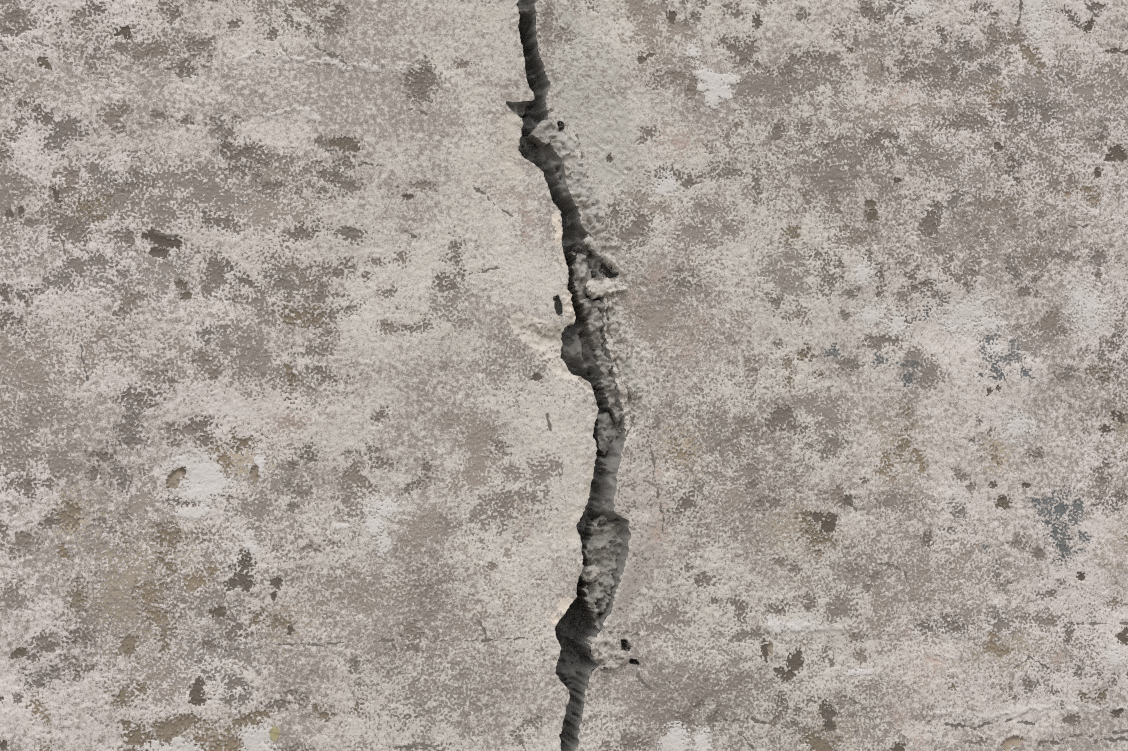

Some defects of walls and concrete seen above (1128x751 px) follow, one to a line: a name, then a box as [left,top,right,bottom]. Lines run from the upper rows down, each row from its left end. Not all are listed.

crack [314,45,348,68]
crack [358,162,399,197]
crack [473,185,513,217]
crack [506,0,665,751]
crack [229,619,528,651]
crack [399,741,442,749]